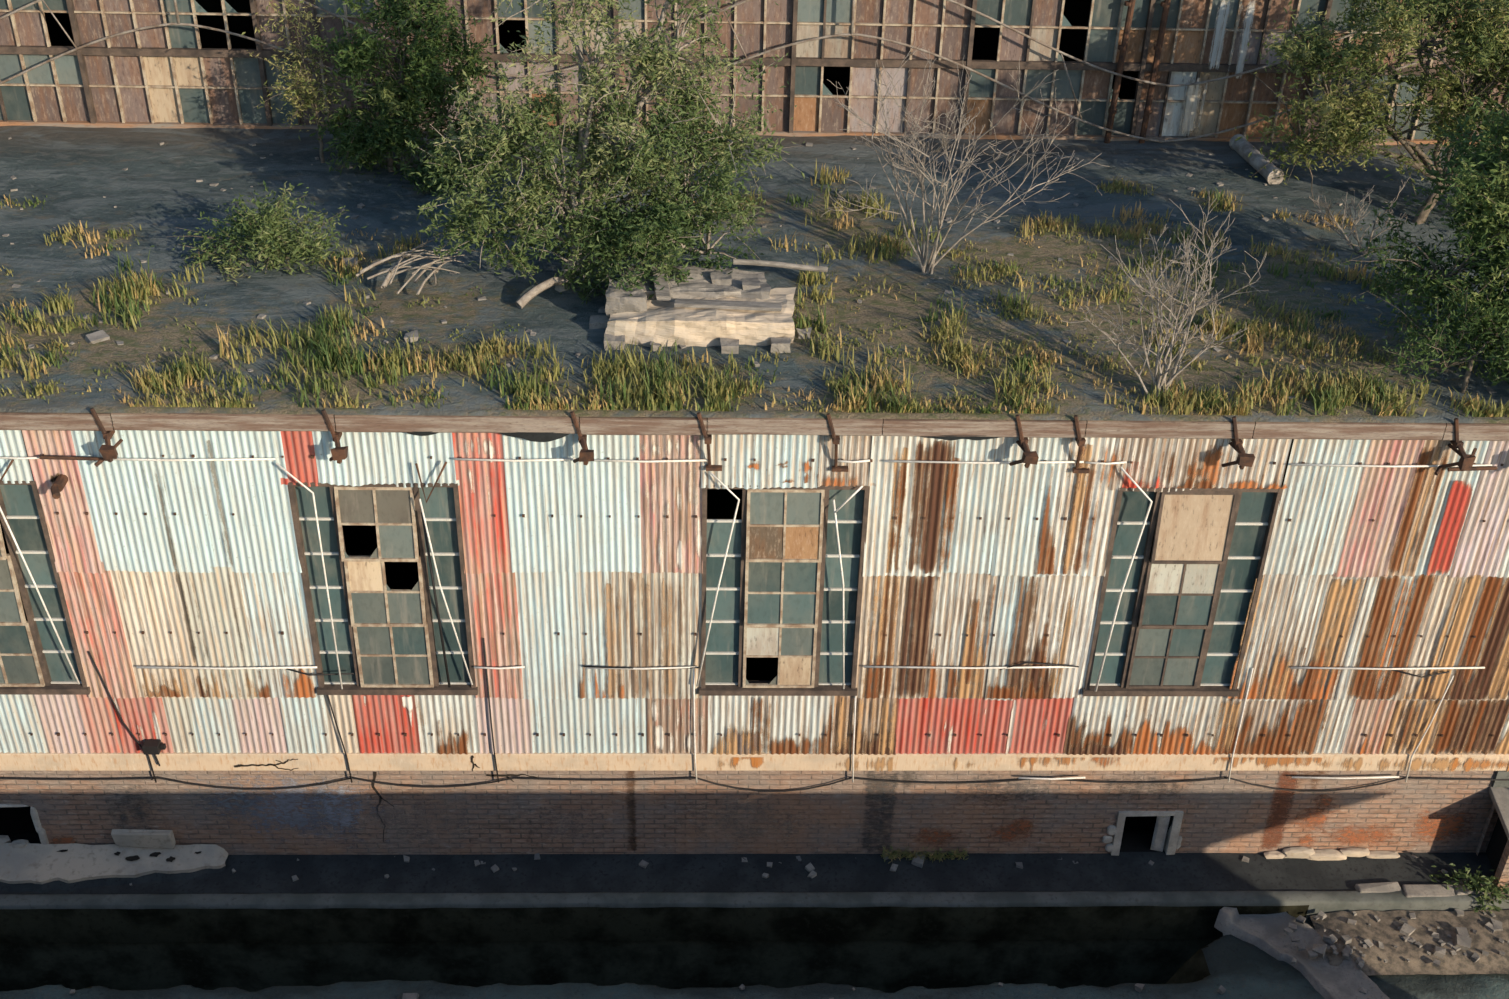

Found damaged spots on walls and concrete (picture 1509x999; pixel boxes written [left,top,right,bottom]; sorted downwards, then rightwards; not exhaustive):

crack [371,772,394,842]
corrosion [719,440,1175,771]
corrosion [1020,447,1509,849]